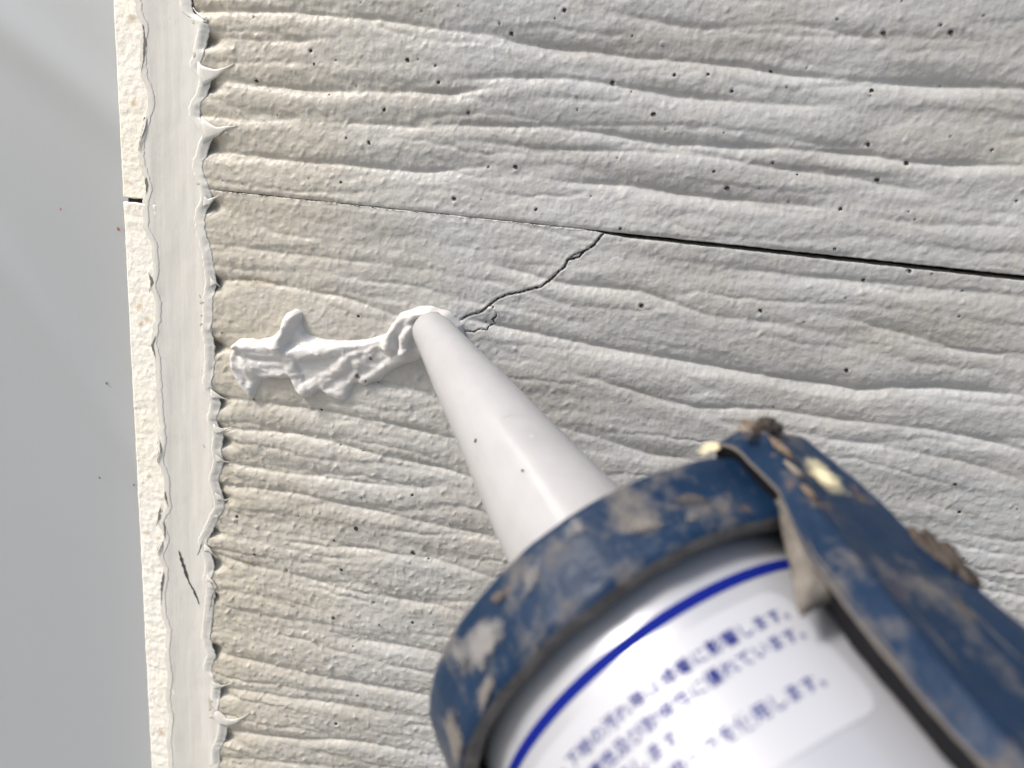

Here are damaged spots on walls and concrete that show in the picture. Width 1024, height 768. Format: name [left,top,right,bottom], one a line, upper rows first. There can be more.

crack [211,188,605,332]